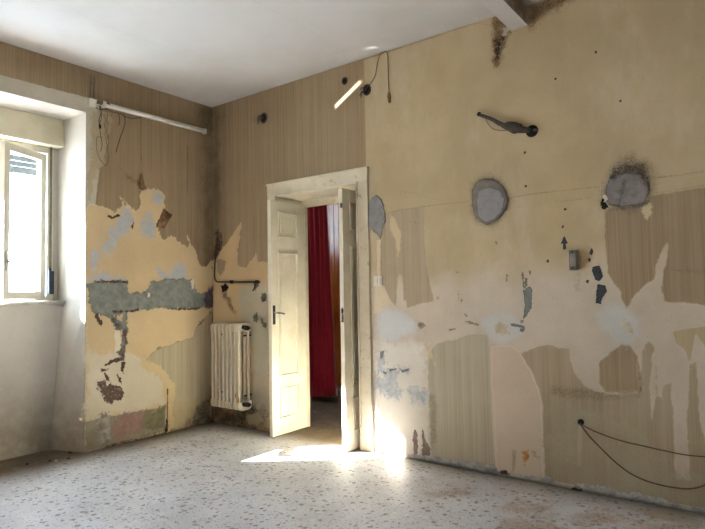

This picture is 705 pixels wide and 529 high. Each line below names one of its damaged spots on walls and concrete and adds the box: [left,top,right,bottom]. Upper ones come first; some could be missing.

water stain [490,16,511,68]
water stain [505,0,573,33]
peeling [79,110,270,451]
spalling [510,271,532,332]
peeling [592,266,607,304]
peeling [372,330,705,514]